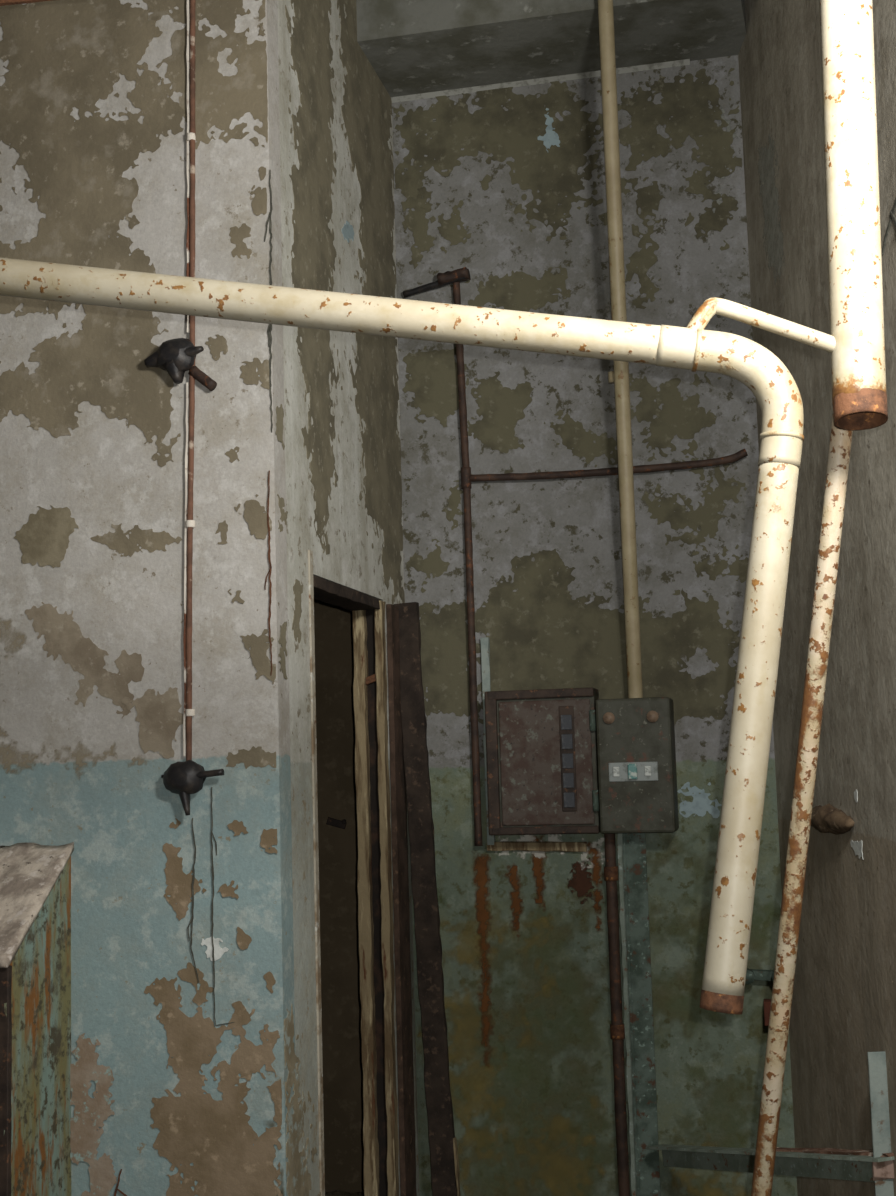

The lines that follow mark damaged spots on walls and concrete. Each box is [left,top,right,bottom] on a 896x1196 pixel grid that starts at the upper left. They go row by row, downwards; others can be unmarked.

peeling [0,295,181,467]
peeling [0,0,268,273]
peeling [285,0,607,298]
peeling [464,264,571,312]
peeling [617,68,742,309]
peeling [14,505,79,568]
peeling [296,327,749,725]
peeling [25,602,183,759]
corrosion [473,855,493,1066]
corrosion [506,835,546,937]
corrosion [567,842,603,930]
peeling [144,962,321,1196]